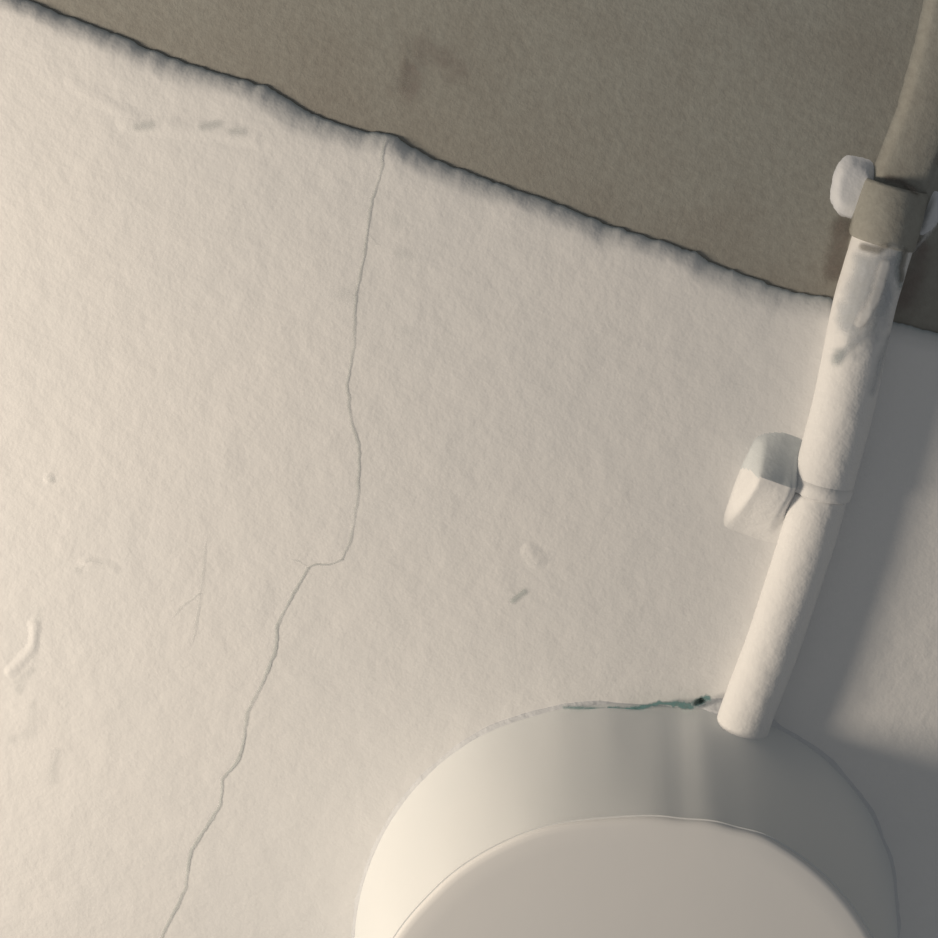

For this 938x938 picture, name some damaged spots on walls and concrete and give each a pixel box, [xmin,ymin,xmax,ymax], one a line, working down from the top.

crack [353,140,385,323]
peeling [840,244,908,343]
crack [346,365,360,490]
crack [260,551,345,687]
crack [160,718,248,938]